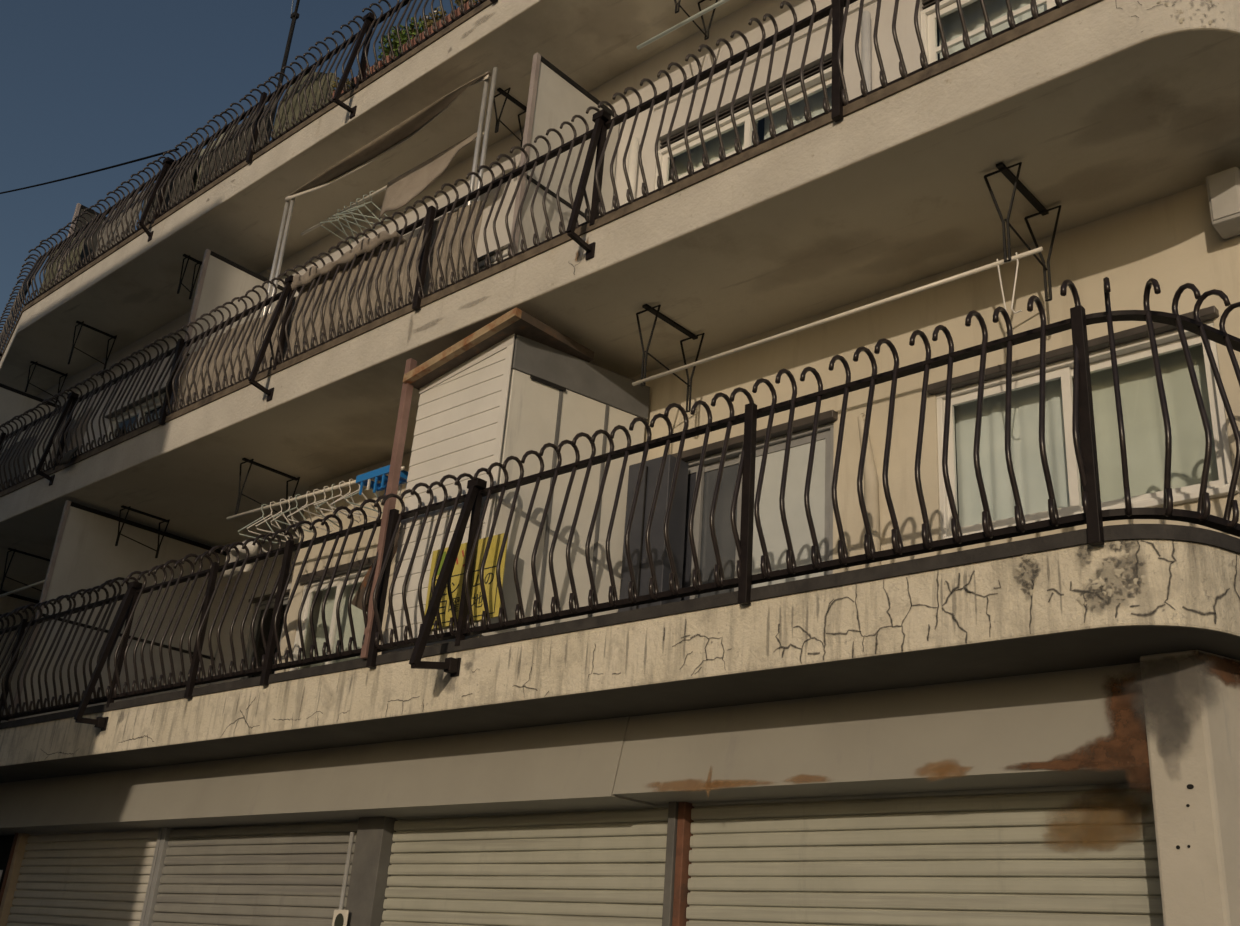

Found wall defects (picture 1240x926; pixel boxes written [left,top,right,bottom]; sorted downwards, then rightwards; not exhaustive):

crack [663,626,732,676]
crack [775,571,1001,664]
spalling [1015,554,1039,596]
spalling [1076,541,1147,611]
crack [1029,540,1240,634]
corrosion [1008,673,1150,781]
damp [1135,654,1211,752]
corrosion [655,772,768,793]
corrosion [921,762,968,778]